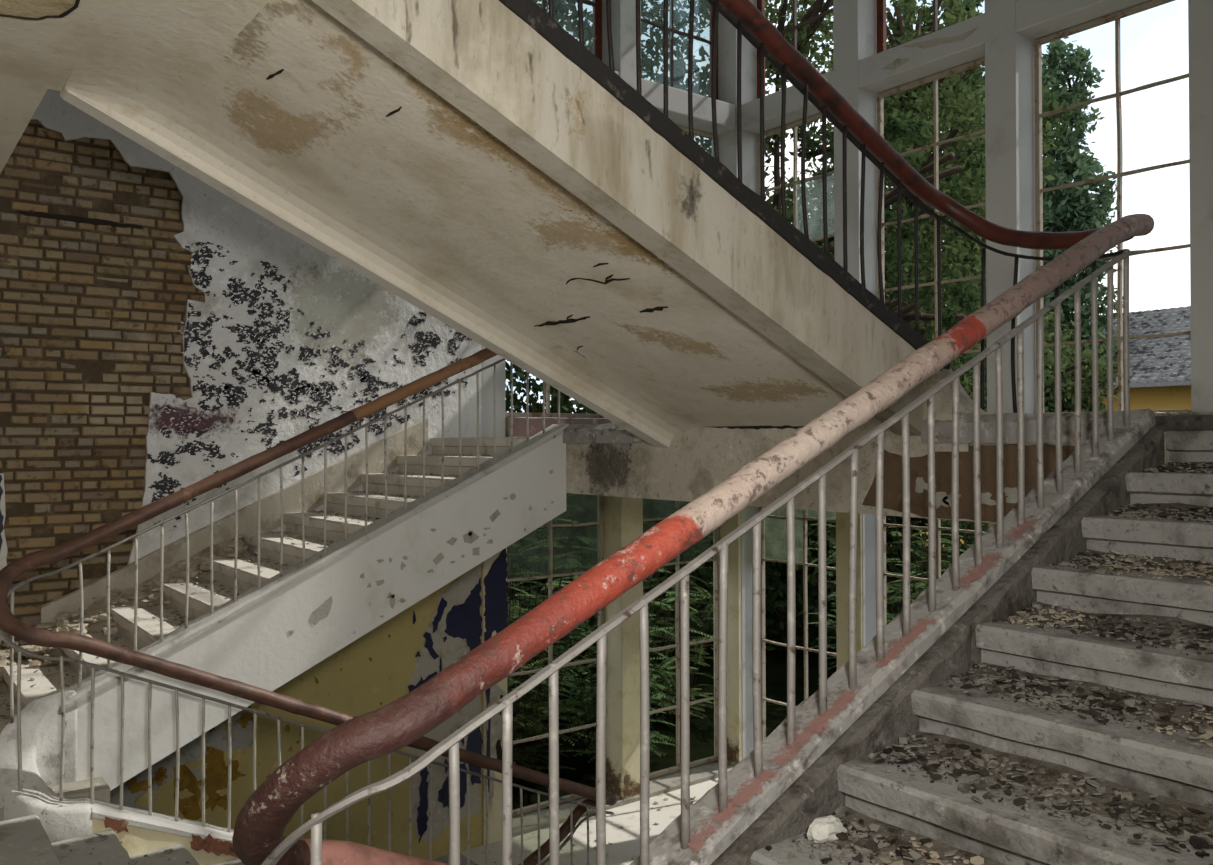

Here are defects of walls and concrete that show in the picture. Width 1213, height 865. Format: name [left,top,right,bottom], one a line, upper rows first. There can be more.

flaking render [0,0,80,20]
peeling [0,119,472,626]
leakage [583,443,631,497]
peeling [360,493,516,693]
peeling [407,684,505,843]